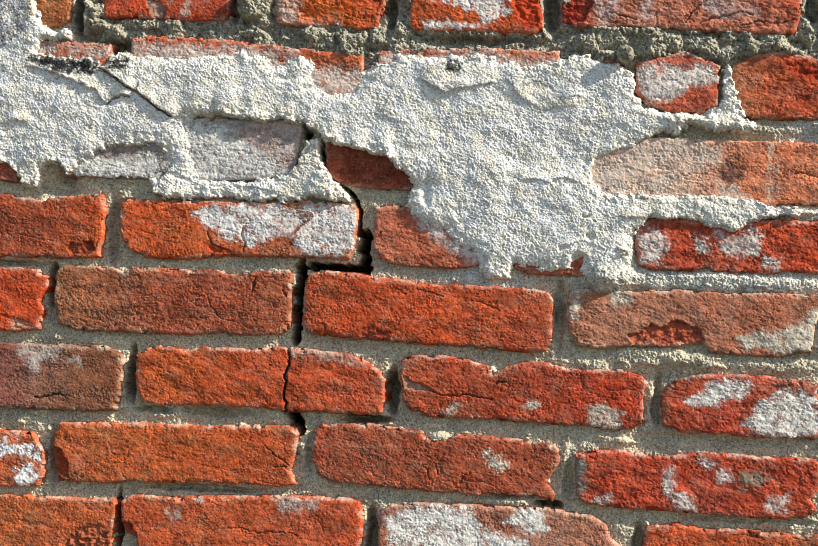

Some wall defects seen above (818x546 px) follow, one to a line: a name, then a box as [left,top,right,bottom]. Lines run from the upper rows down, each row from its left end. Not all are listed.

peeling [422,0,543,31]
peeling [26,54,321,131]
peeling [421,64,500,91]
water stain [636,60,720,103]
peeling [284,145,342,199]
water stain [191,202,357,258]
peeling [622,197,767,229]
crack [285,231,374,343]
crack [294,412,307,430]
water stain [683,376,753,408]
water stain [741,387,818,438]
water stain [382,503,551,546]